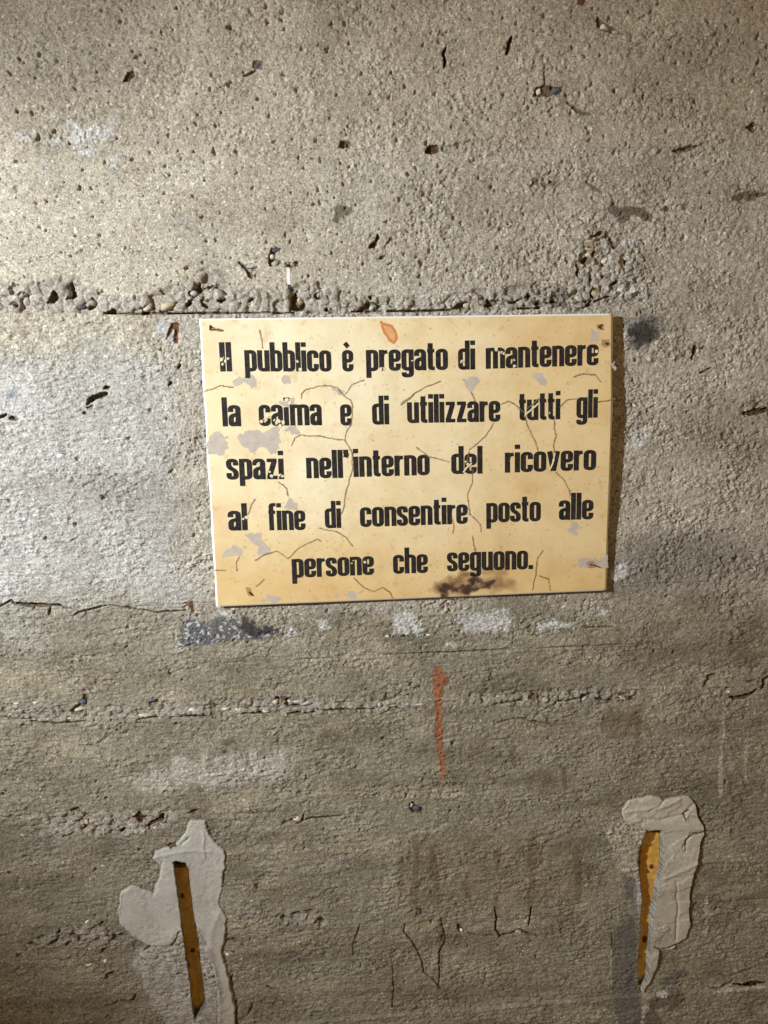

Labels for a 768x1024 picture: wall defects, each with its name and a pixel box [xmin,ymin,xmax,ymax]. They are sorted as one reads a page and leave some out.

crack [0,599,187,616]
peeling [241,616,272,637]
corrosion [432,667,448,781]
spalling [16,919,138,980]
corrosion [175,863,205,1012]
spalling [243,900,330,928]
crack [392,964,403,1008]
crack [403,923,441,989]
corrosion [638,830,660,982]